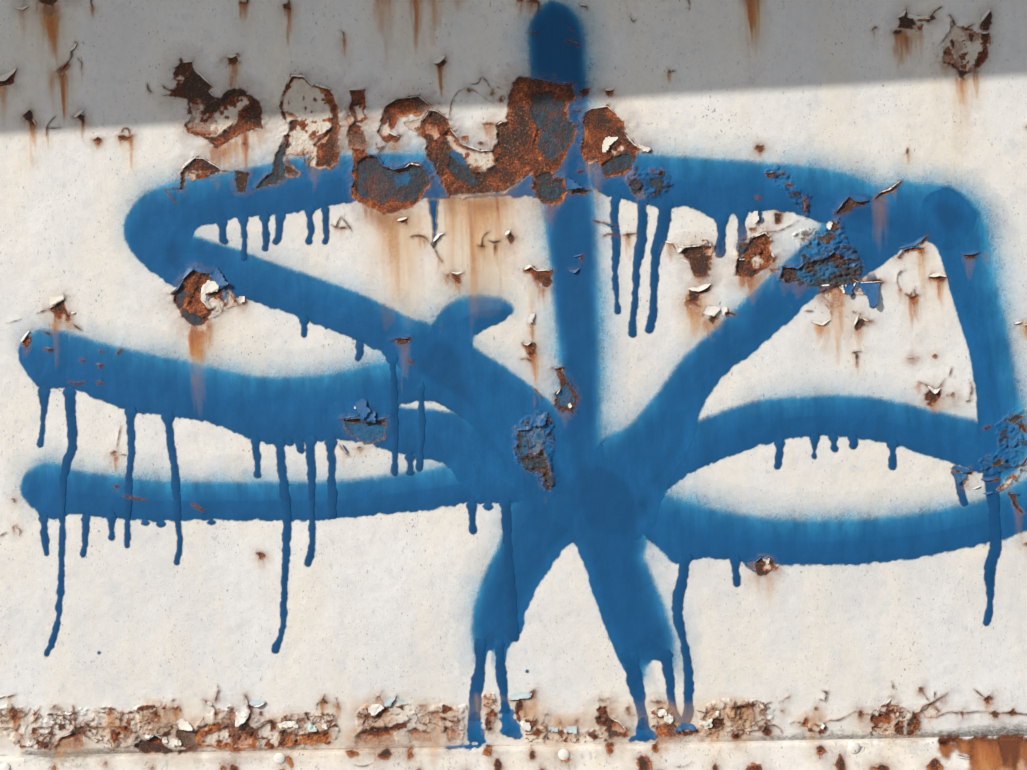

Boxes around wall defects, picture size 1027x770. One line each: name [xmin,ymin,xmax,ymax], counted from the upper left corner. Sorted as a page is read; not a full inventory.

peeling [433,55,447,93]
rust [162,58,263,203]
peeling [461,122,495,145]
rust [345,76,651,239]
peeling [628,168,668,197]
peeling [340,399,387,455]
peeling [514,367,577,491]
peeling [951,415,1027,513]
rust [133,706,259,755]
rust [595,699,629,754]
rust [870,685,920,736]
rust [926,735,1027,770]